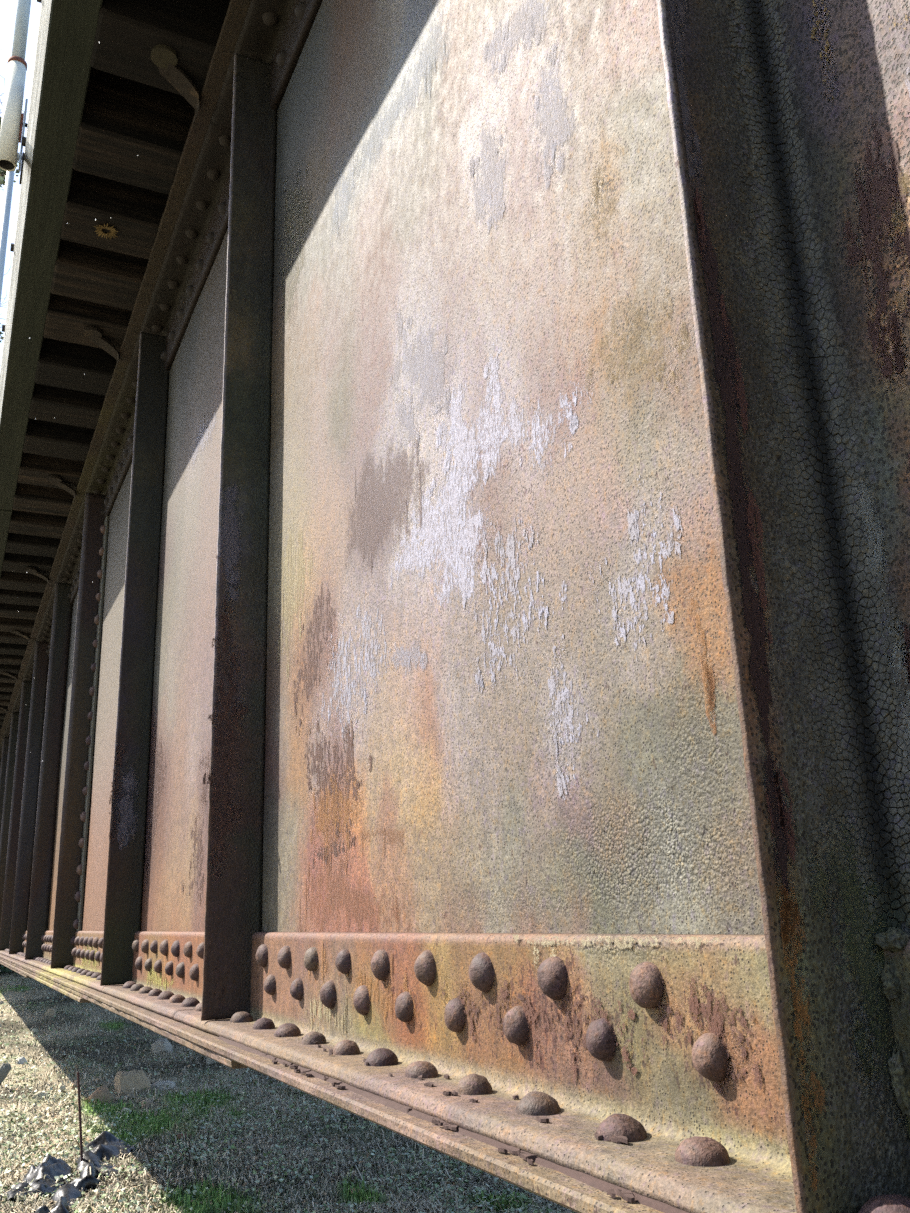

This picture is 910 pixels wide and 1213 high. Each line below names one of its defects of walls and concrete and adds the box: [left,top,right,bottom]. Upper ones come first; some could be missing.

corrosion [837,102,910,381]
crack [725,0,910,982]
corrosion [690,188,810,1060]
corrosion [144,710,165,886]
corrosion [182,599,248,903]
corrosion [293,582,403,868]
corrosion [308,942,421,1025]
corrosion [418,1074,478,1103]
corrosion [438,971,645,1083]
corrosion [594,1132,628,1144]
corrosion [652,976,762,1094]